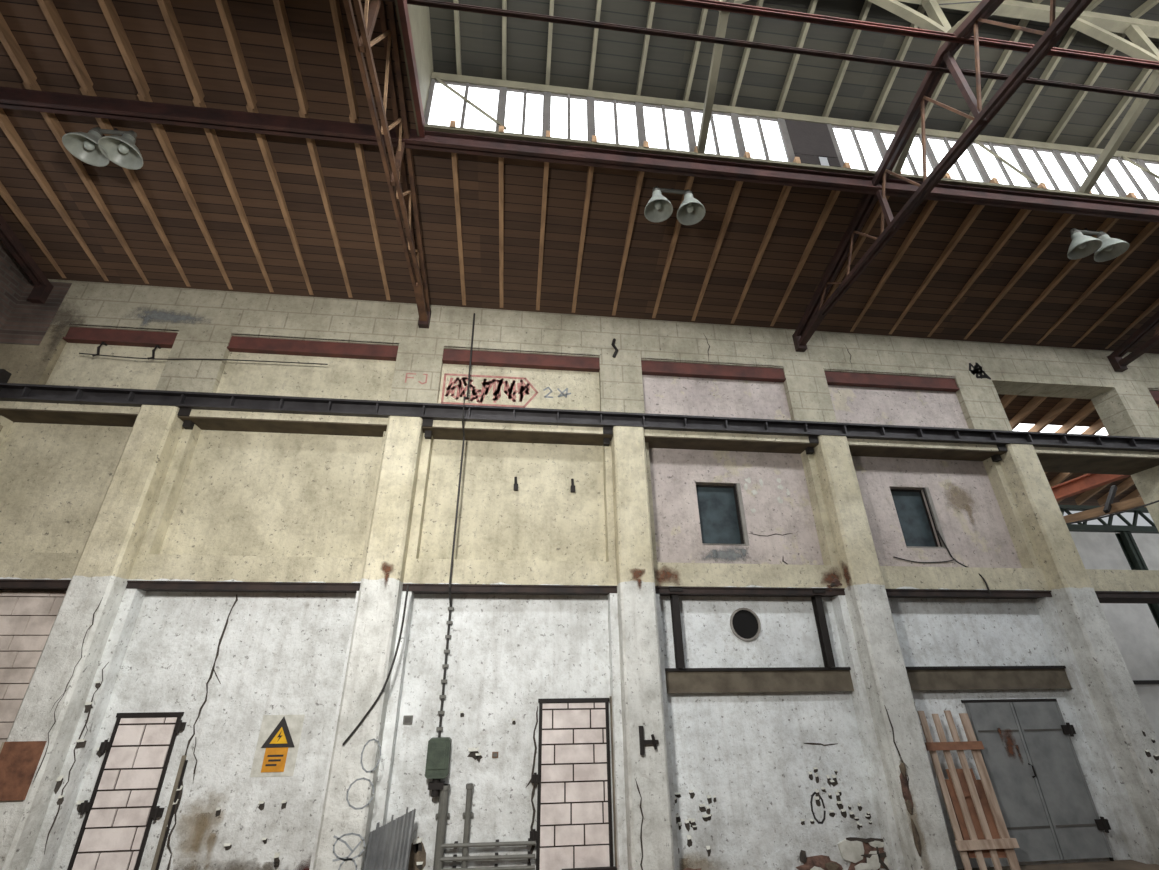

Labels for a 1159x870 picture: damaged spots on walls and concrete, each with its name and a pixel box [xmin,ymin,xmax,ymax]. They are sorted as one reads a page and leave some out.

corrosion [631,568,679,588]
crack [167,594,238,870]
leakage [185,811,218,851]
spalling [796,767,889,870]